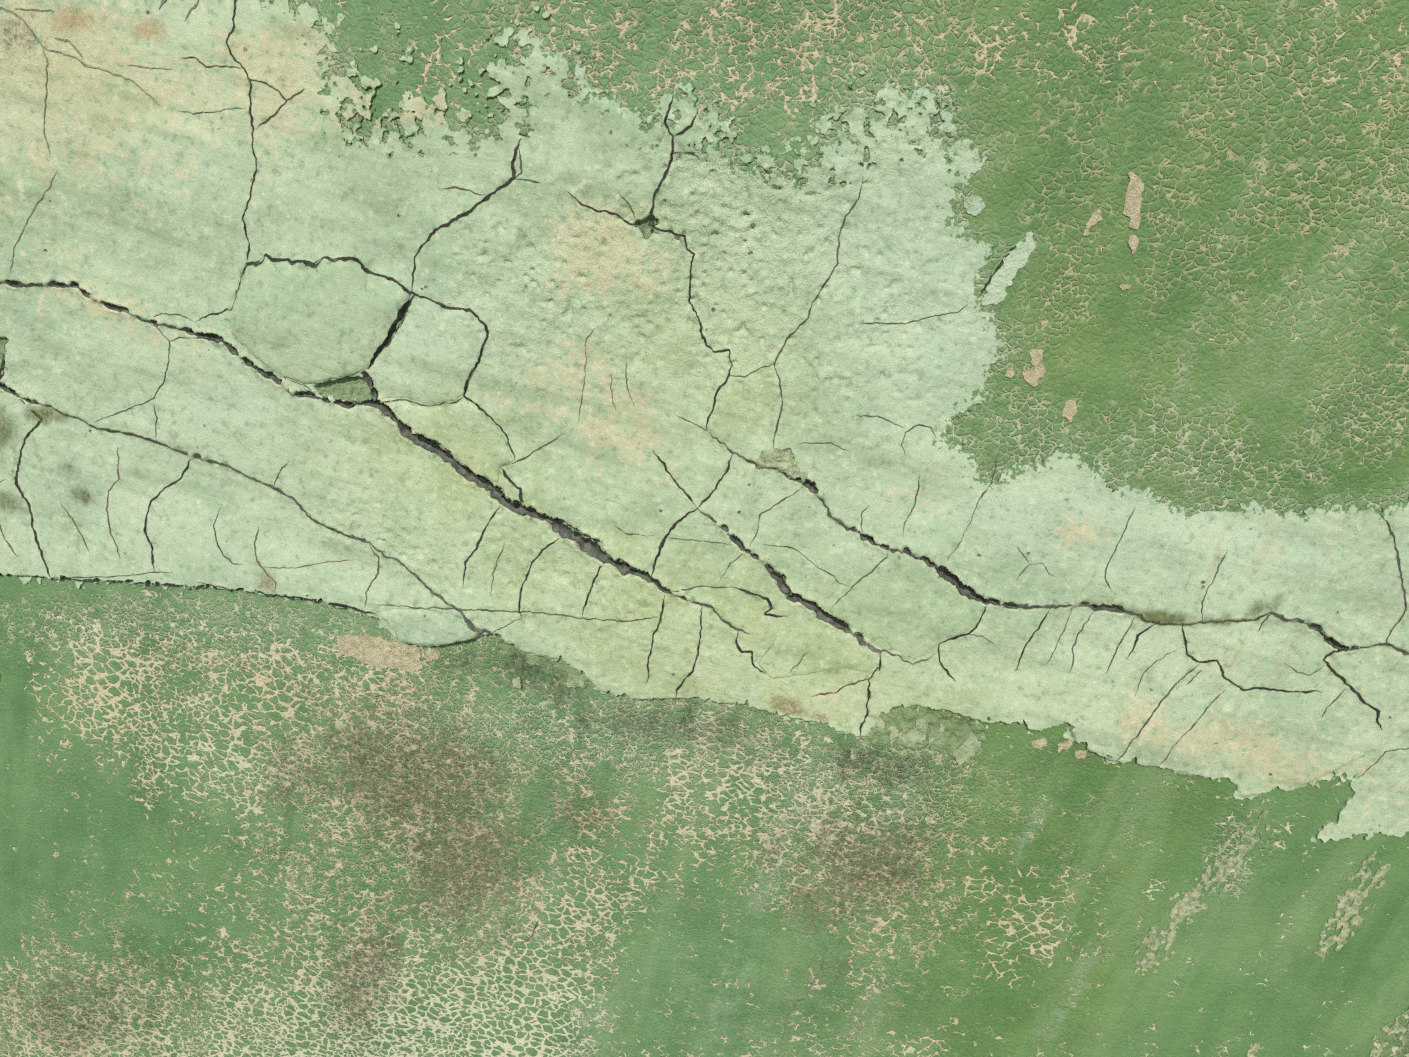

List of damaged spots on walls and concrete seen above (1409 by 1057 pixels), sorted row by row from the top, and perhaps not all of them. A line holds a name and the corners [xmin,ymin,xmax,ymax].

crack [0,0,1409,788]
peeling [0,0,1409,843]
crack [832,793,863,900]
peeling [1132,803,1270,978]
peeling [1314,850,1391,961]